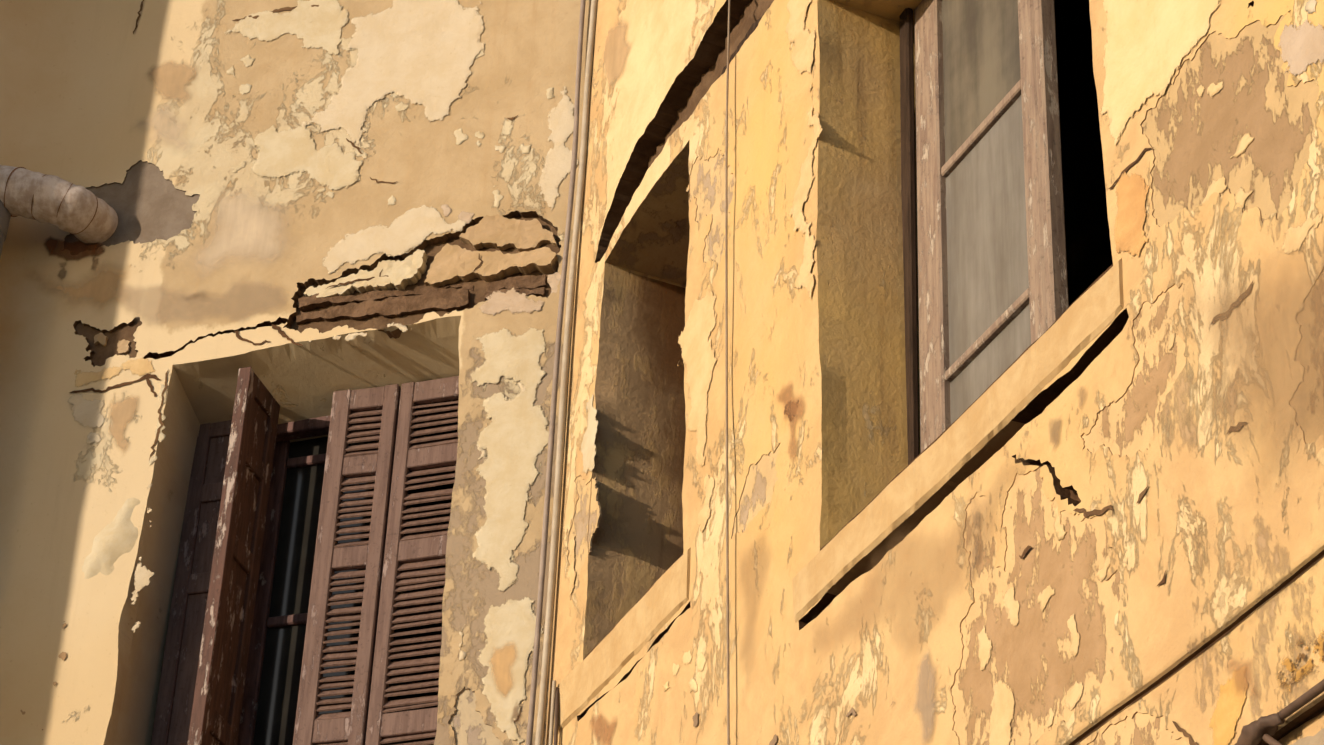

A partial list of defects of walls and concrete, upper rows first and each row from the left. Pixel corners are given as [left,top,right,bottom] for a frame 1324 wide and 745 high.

peeling [224,0,485,198]
flaking render [1101,0,1324,259]
peeling [322,196,474,274]
flaking render [68,317,170,465]
crack [70,317,303,460]
peeling [448,288,556,745]
flaking render [567,395,601,601]
peeling [677,290,718,532]
crack [799,589,837,630]
flaking render [950,466,1123,745]
crack [1011,308,1129,424]
crack [1012,455,1148,517]